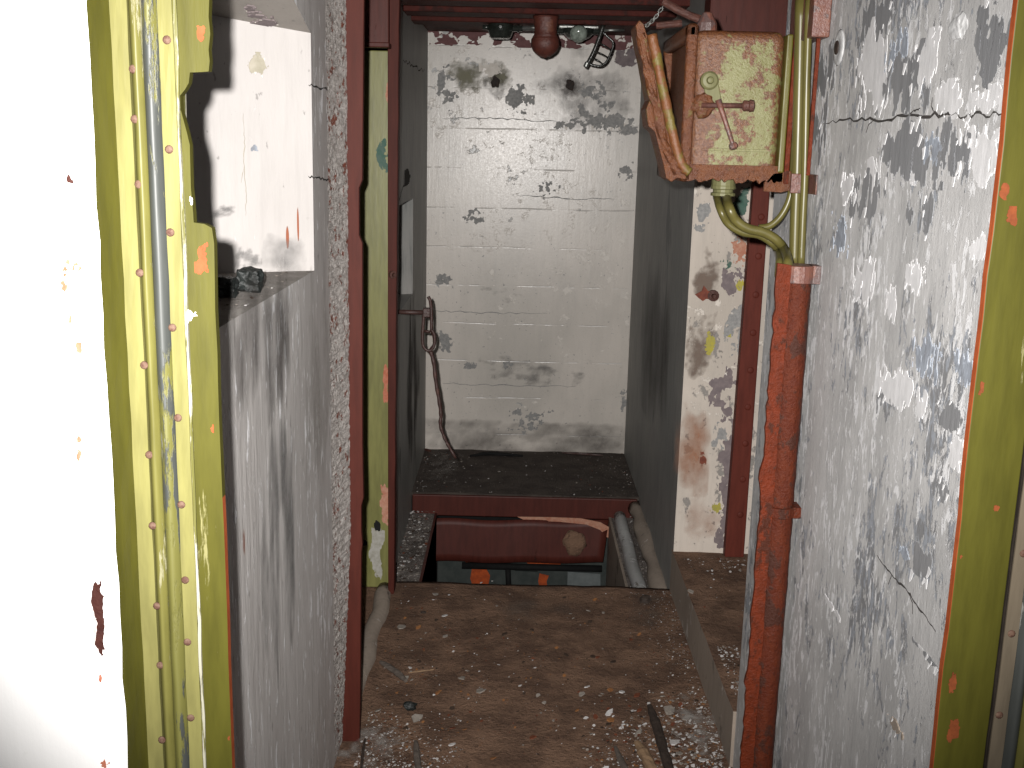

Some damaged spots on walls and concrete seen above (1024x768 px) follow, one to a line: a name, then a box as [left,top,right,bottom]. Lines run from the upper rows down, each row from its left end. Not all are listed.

damp [449,67,508,89]
peeling [428,31,532,50]
peeling [557,34,637,67]
crack [826,97,1001,132]
peeling [812,0,1011,325]
peeling [999,183,1017,226]
flaking render [325,0,388,759]
peeling [708,267,745,549]
peeling [876,330,985,504]
corrosion [91,581,105,659]
crack [877,555,936,632]